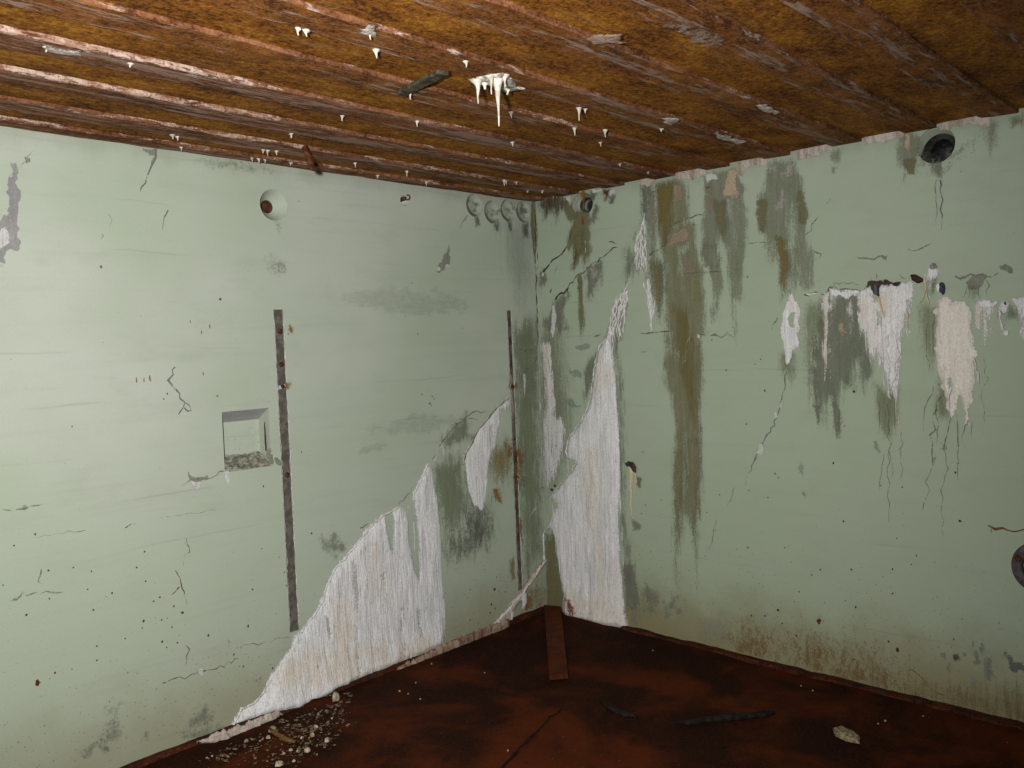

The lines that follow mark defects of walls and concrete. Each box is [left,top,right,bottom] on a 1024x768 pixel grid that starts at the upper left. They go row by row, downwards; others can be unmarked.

damp [0,24,283,91]
damp [0,64,336,129]
damp [97,112,331,165]
peeling [0,151,33,268]
crack [517,209,617,396]
spalling [867,274,923,296]
corrosion [490,442,525,502]
damp [197,144,832,743]
crack [706,372,787,551]
crack [163,637,288,683]
damp [1004,652,1024,672]